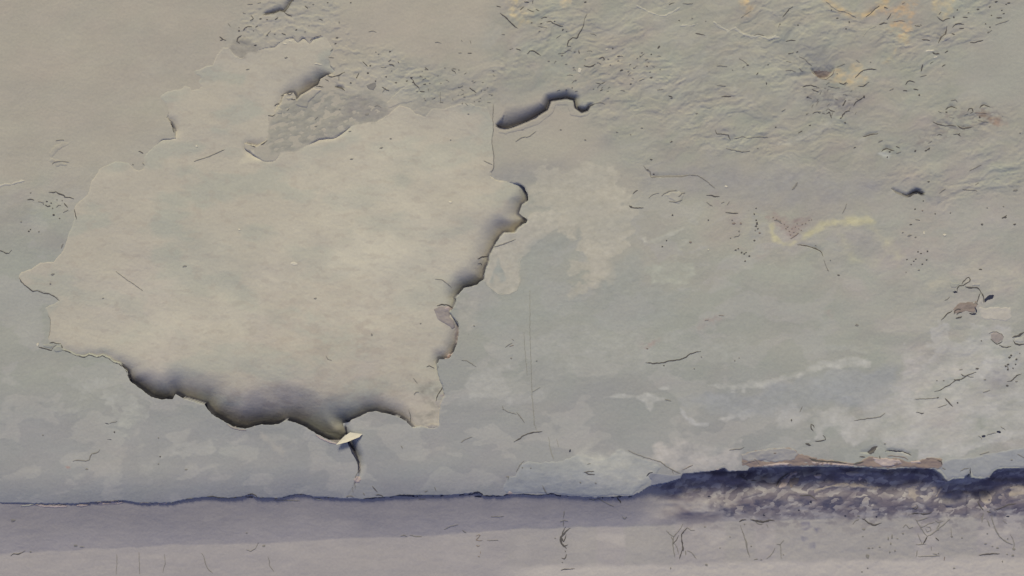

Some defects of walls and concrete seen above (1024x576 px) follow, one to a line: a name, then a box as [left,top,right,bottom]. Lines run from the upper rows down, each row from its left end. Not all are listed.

flaking render [18,0,528,445]
spalling [887,181,957,276]
spalling [941,269,1024,348]
crack [65,421,117,470]
crack [11,441,509,557]